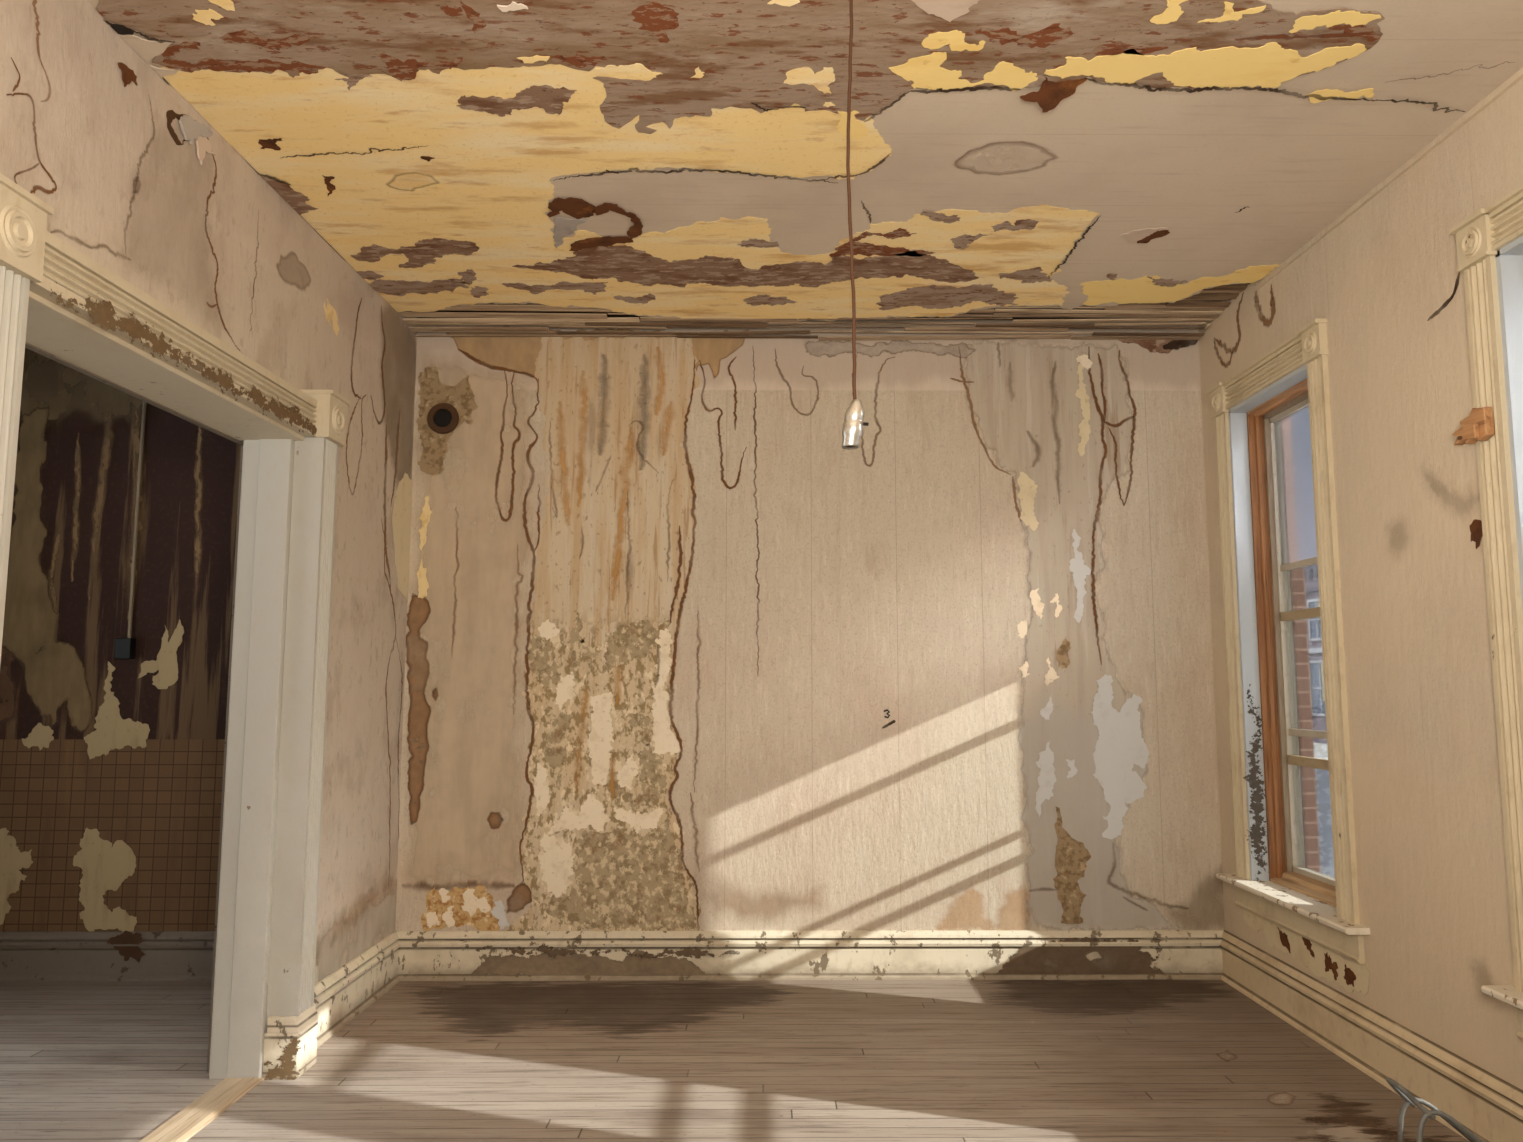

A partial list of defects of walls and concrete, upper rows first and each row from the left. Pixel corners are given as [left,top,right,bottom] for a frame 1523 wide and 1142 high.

crack [6,0,57,194]
peeling [50,282,317,435]
crack [205,137,240,351]
leakage [446,326,749,521]
peeling [161,64,1280,319]
crack [1088,346,1136,665]
peeling [888,10,1381,91]
crack [1162,340,1198,350]
crack [1430,272,1460,319]
peeling [416,337,740,975]
leakage [487,812,503,829]
peeling [997,674,1165,974]